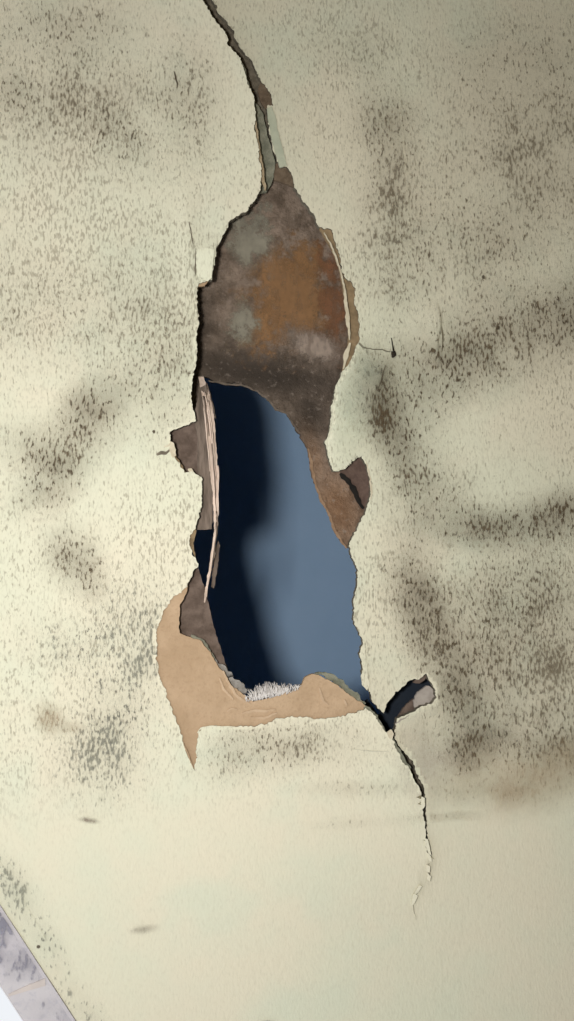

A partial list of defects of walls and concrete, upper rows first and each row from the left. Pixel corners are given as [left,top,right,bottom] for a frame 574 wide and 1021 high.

mould [13,388,114,504]
mould [12,53,120,129]
mould [52,530,100,590]
crack [203,0,287,194]
peeling [155,163,373,769]
corrosion [312,245,346,341]
mould [363,109,419,304]
mould [359,223,574,545]
mould [484,93,574,214]
mould [70,609,158,788]
mould [392,559,574,771]
crack [354,705,432,916]